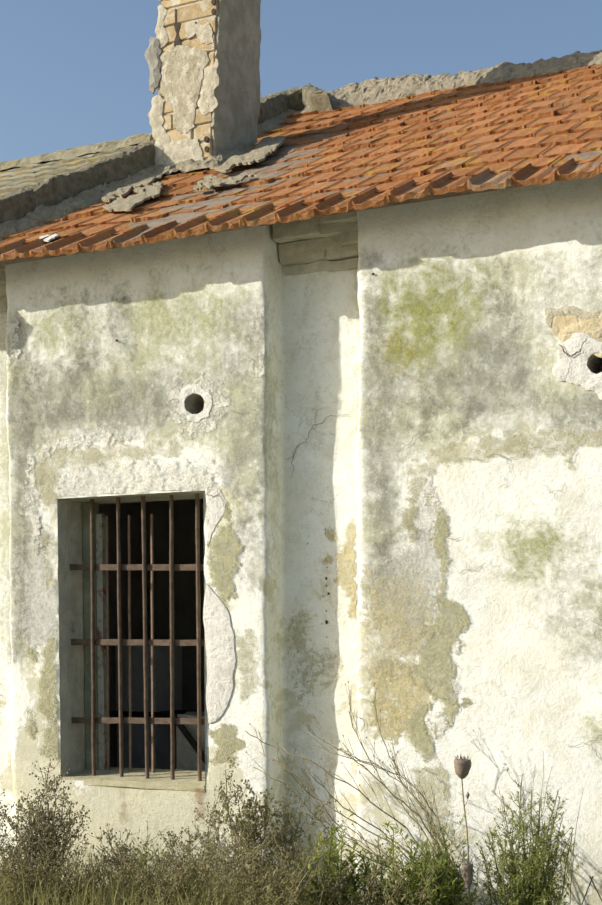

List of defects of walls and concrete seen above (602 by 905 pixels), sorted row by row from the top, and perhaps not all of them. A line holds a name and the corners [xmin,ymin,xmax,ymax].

peeling [144,37,210,134]
spalling [193,108,286,191]
spalling [100,174,164,212]
leakage [247,306,265,392]
spalling [545,306,602,342]
leakage [53,458,215,496]
leakage [164,370,230,439]
crack [287,407,354,476]
leakage [362,429,602,634]
peeling [203,485,257,766]
peeling [287,610,341,705]
peeling [322,493,472,835]